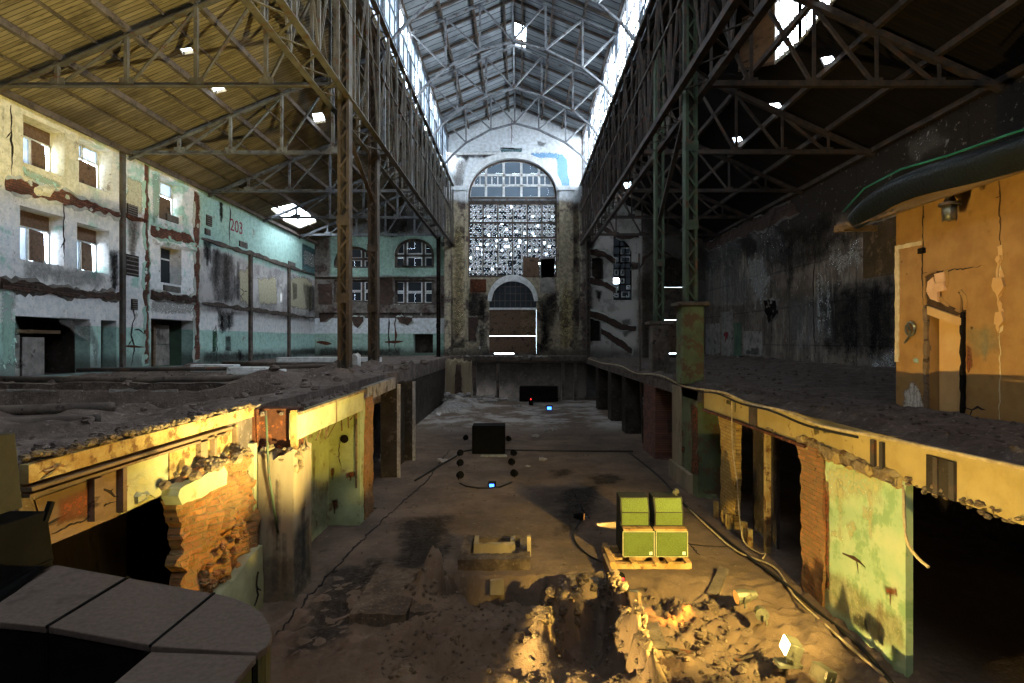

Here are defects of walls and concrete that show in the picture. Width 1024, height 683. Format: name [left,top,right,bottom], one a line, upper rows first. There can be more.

crack [6,106,14,175]
spalling [0,163,201,369]
leakage [204,246,276,363]
leakage [817,243,895,367]
crack [994,182,1002,245]
peeling [991,245,1006,334]
spalling [304,426,329,542]
spalling [796,435,913,678]